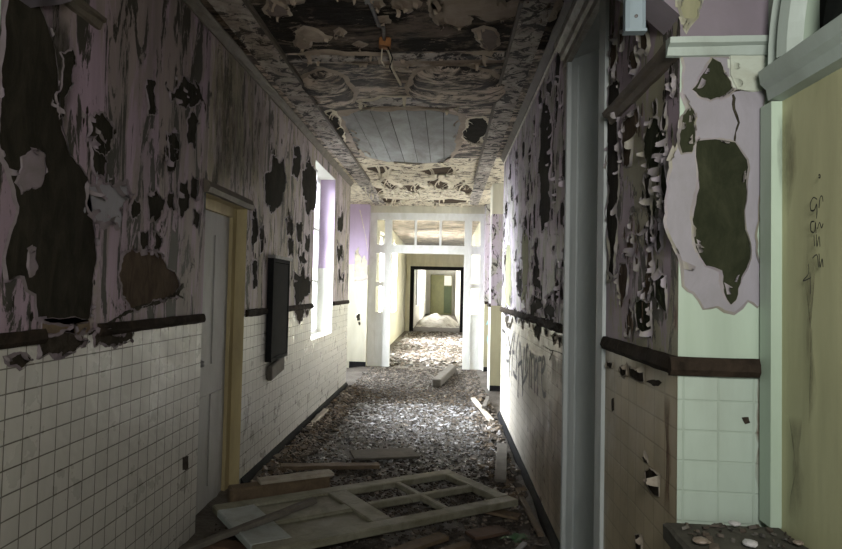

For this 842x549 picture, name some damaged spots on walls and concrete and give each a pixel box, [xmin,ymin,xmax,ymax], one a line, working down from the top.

peeling [262,0,305,22]
peeling [293,0,529,71]
peeling [675,0,703,34]
spalling [324,109,371,156]
crack [732,89,748,141]
peeling [0,0,207,371]
peeling [250,208,266,290]
peeling [264,139,318,325]
spalling [357,158,473,209]
peeling [502,52,565,348]
peeling [603,15,766,341]
spalling [642,449,661,497]